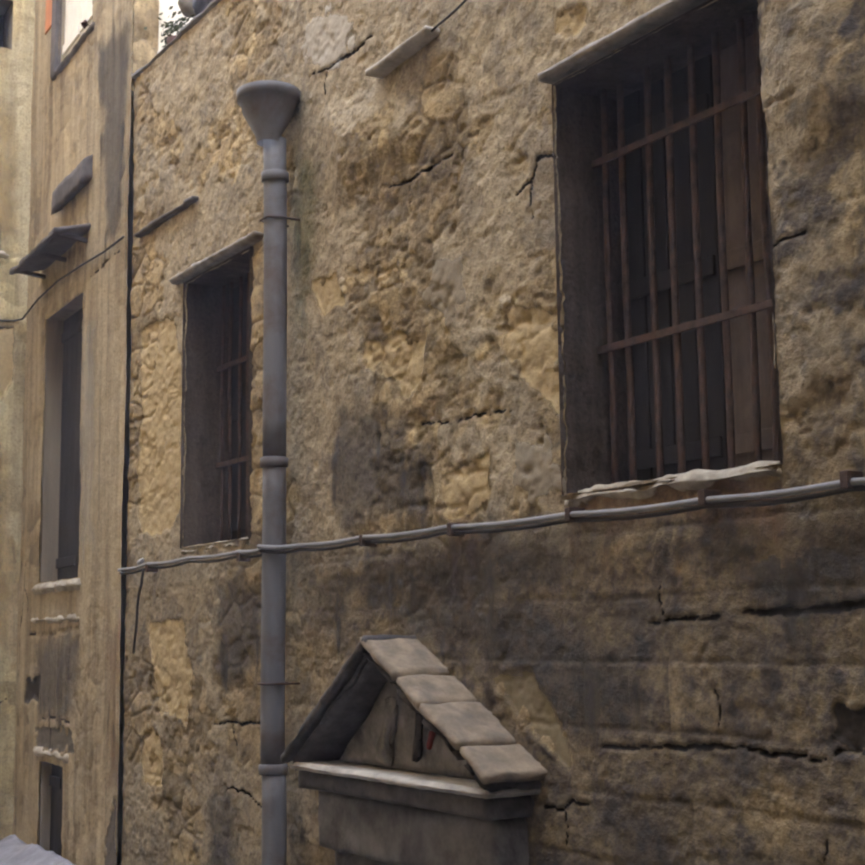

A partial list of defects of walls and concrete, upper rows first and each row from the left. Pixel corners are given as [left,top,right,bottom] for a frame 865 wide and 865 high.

crack [515,154,557,220]
crack [602,689,865,763]
spalling [832,699,865,769]